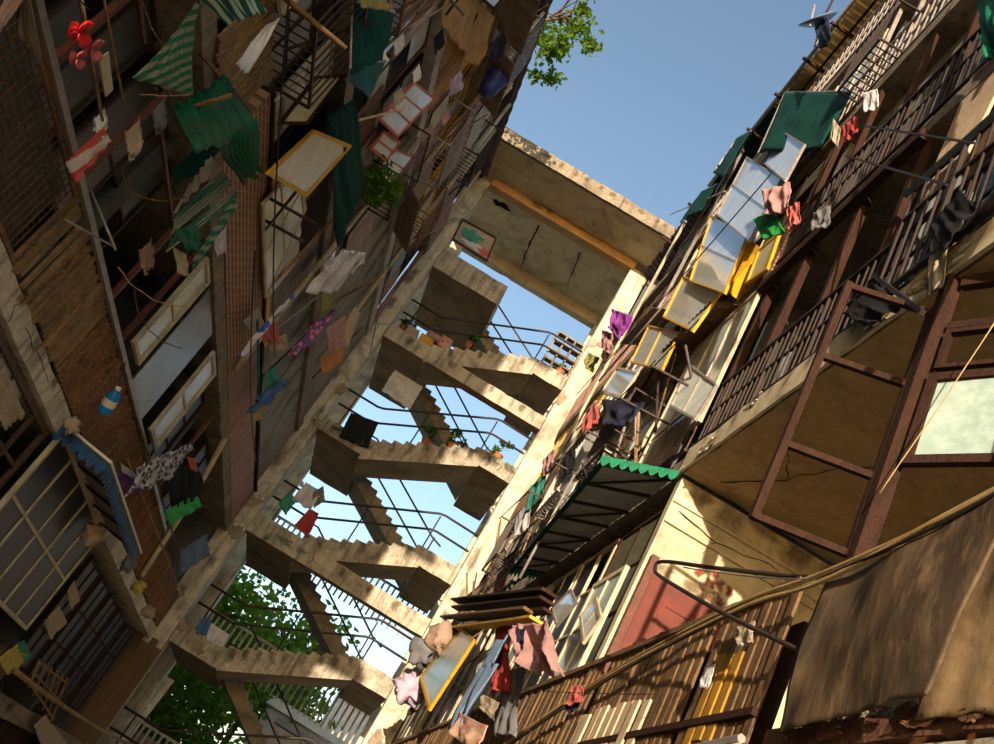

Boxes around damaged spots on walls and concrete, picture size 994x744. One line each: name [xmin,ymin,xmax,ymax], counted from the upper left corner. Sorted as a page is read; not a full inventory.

crack [520,225,540,269]
crack [721,450,838,483]
leakage [692,492,711,504]
crack [679,511,816,602]
rust [899,717,936,744]
rust [958,707,986,744]